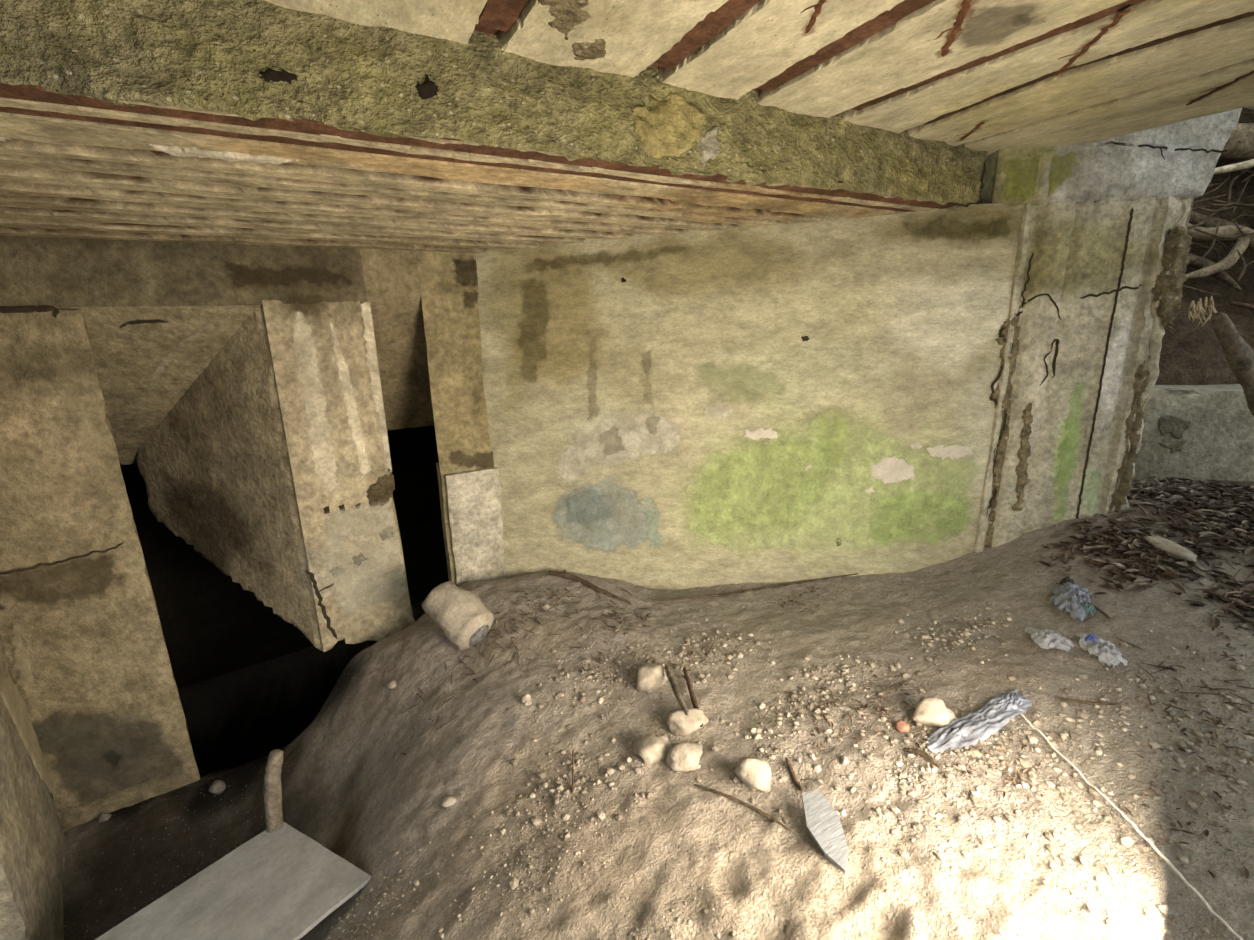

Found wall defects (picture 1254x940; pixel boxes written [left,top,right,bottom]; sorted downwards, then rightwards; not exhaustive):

peeling [146,144,299,165]
crack [1020,208,1142,518]
water stain [554,413,681,552]
water stain [699,442,827,531]
water stain [0,556,121,610]
crack [306,570,337,639]
water stain [0,625,182,802]